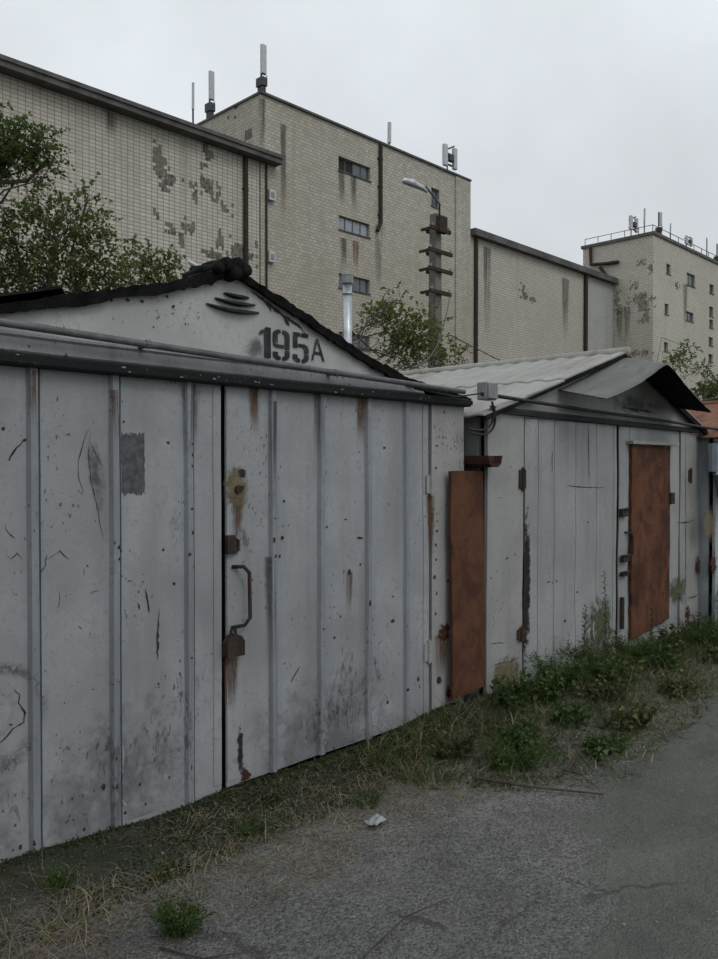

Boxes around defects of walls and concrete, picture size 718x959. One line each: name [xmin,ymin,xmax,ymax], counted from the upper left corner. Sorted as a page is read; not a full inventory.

spalling [152,139,234,218]
spalling [153,207,195,248]
spalling [201,228,258,268]
spalling [614,280,656,325]
rust [224,468,246,527]
rust [522,513,531,663]
rust [237,727,252,781]